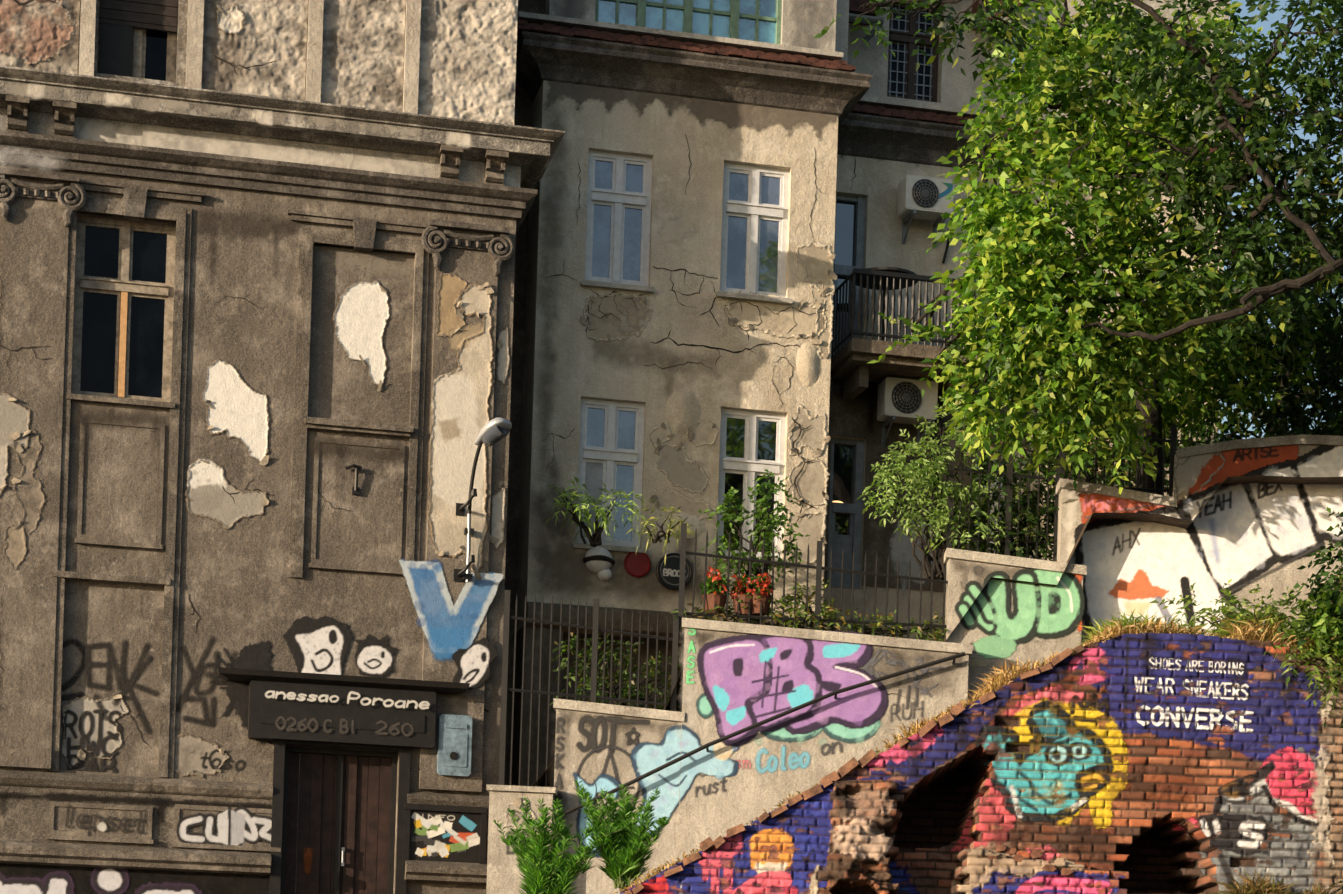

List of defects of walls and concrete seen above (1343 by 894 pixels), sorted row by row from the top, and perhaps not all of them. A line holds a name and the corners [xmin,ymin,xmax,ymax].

peeling [332,280,390,392]
peeling [580,292,653,343]
peeling [0,393,46,570]
peeling [185,459,269,529]
peeling [201,358,270,466]
peeling [427,273,510,581]
peeling [649,420,720,521]
crack [550,262,828,522]
spalling [828,792,894,861]
spalling [833,885,876,894]